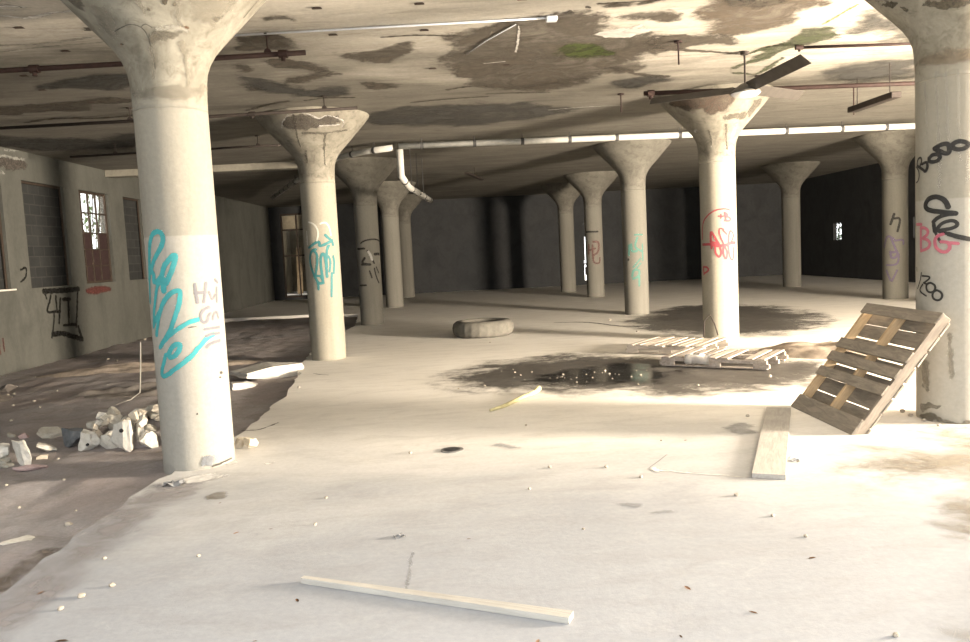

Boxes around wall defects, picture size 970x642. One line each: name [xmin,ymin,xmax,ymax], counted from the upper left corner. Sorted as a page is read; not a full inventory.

spalling [922,0,970,10]
spalling [150,26,188,45]
damp [235,16,355,111]
damp [341,0,831,127]
peeling [281,113,347,165]
damp [448,353,820,396]